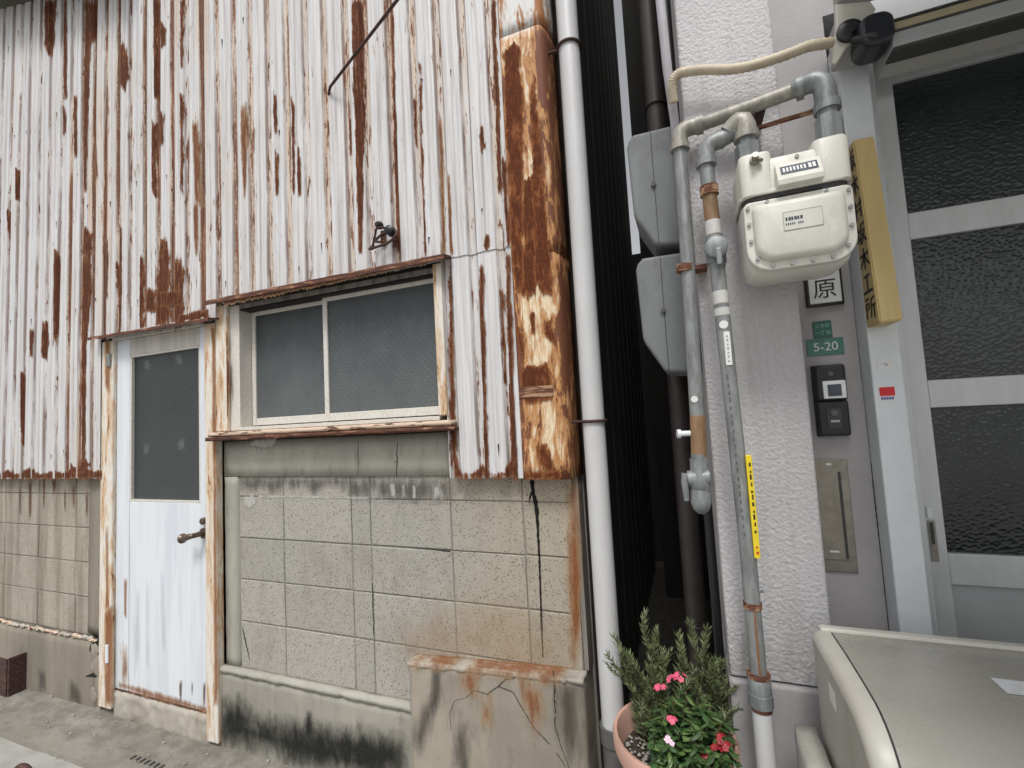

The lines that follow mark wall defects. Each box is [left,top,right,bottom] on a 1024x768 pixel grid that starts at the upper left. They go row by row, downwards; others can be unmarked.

corrosion [6,167,21,241]
corrosion [44,0,98,190]
corrosion [120,33,130,93]
corrosion [151,0,166,199]
corrosion [179,93,203,255]
corrosion [224,0,428,306]
corrosion [438,0,562,482]
corrosion [0,226,122,516]
corrosion [105,238,230,712]
leakage [221,703,404,768]
crack [450,480,569,768]
corrosion [463,486,581,726]